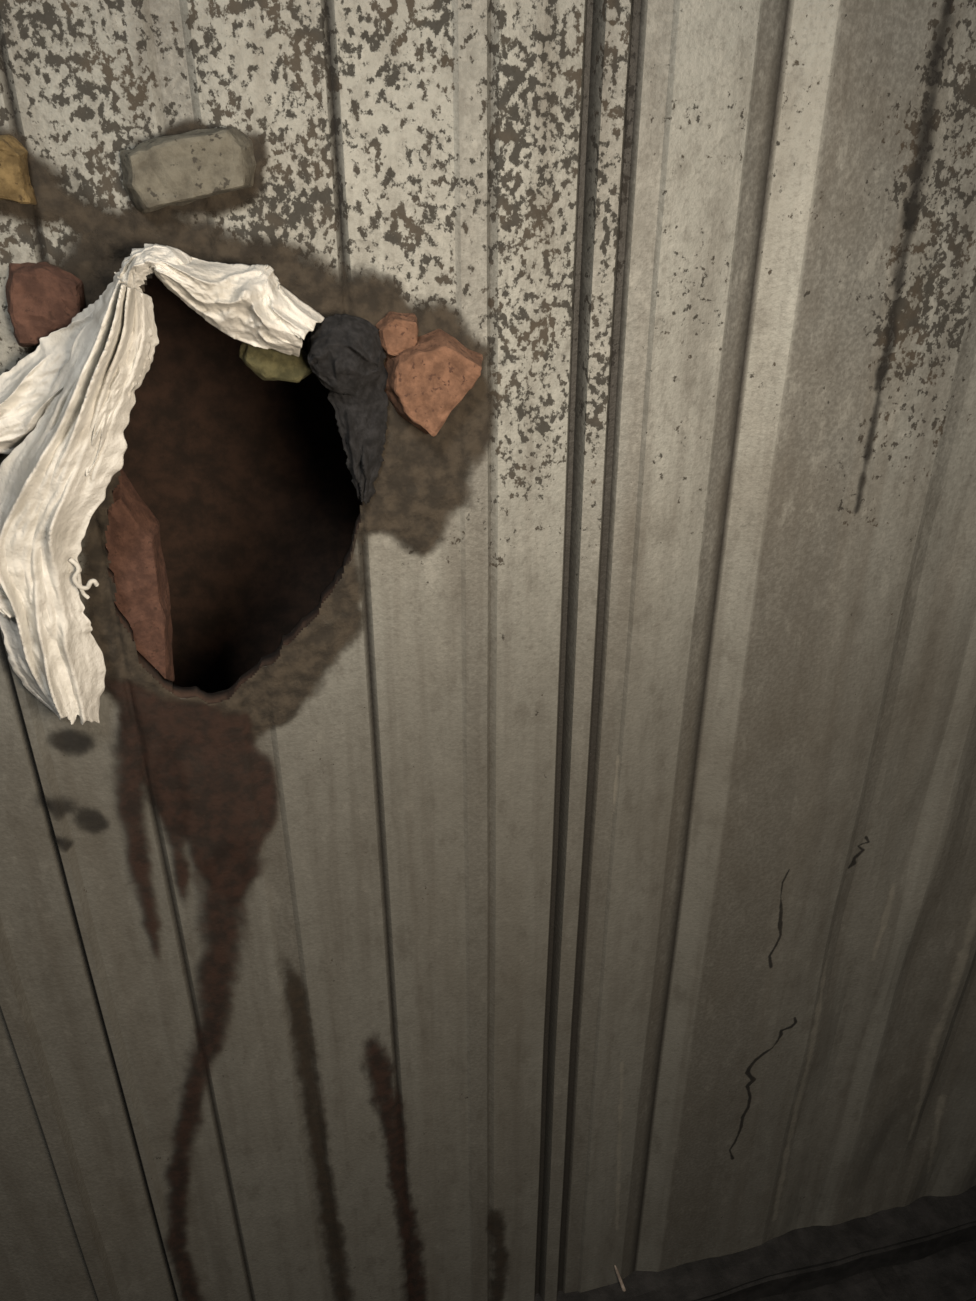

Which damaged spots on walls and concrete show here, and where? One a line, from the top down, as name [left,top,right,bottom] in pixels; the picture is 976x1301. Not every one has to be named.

corrosion [856,0,952,513]
corrosion [105,680,278,1301]
corrosion [287,971,351,1301]
corrosion [367,1040,425,1301]
corrosion [488,1213,508,1301]
crack [729,1017,797,1160]
crack [769,869,790,968]